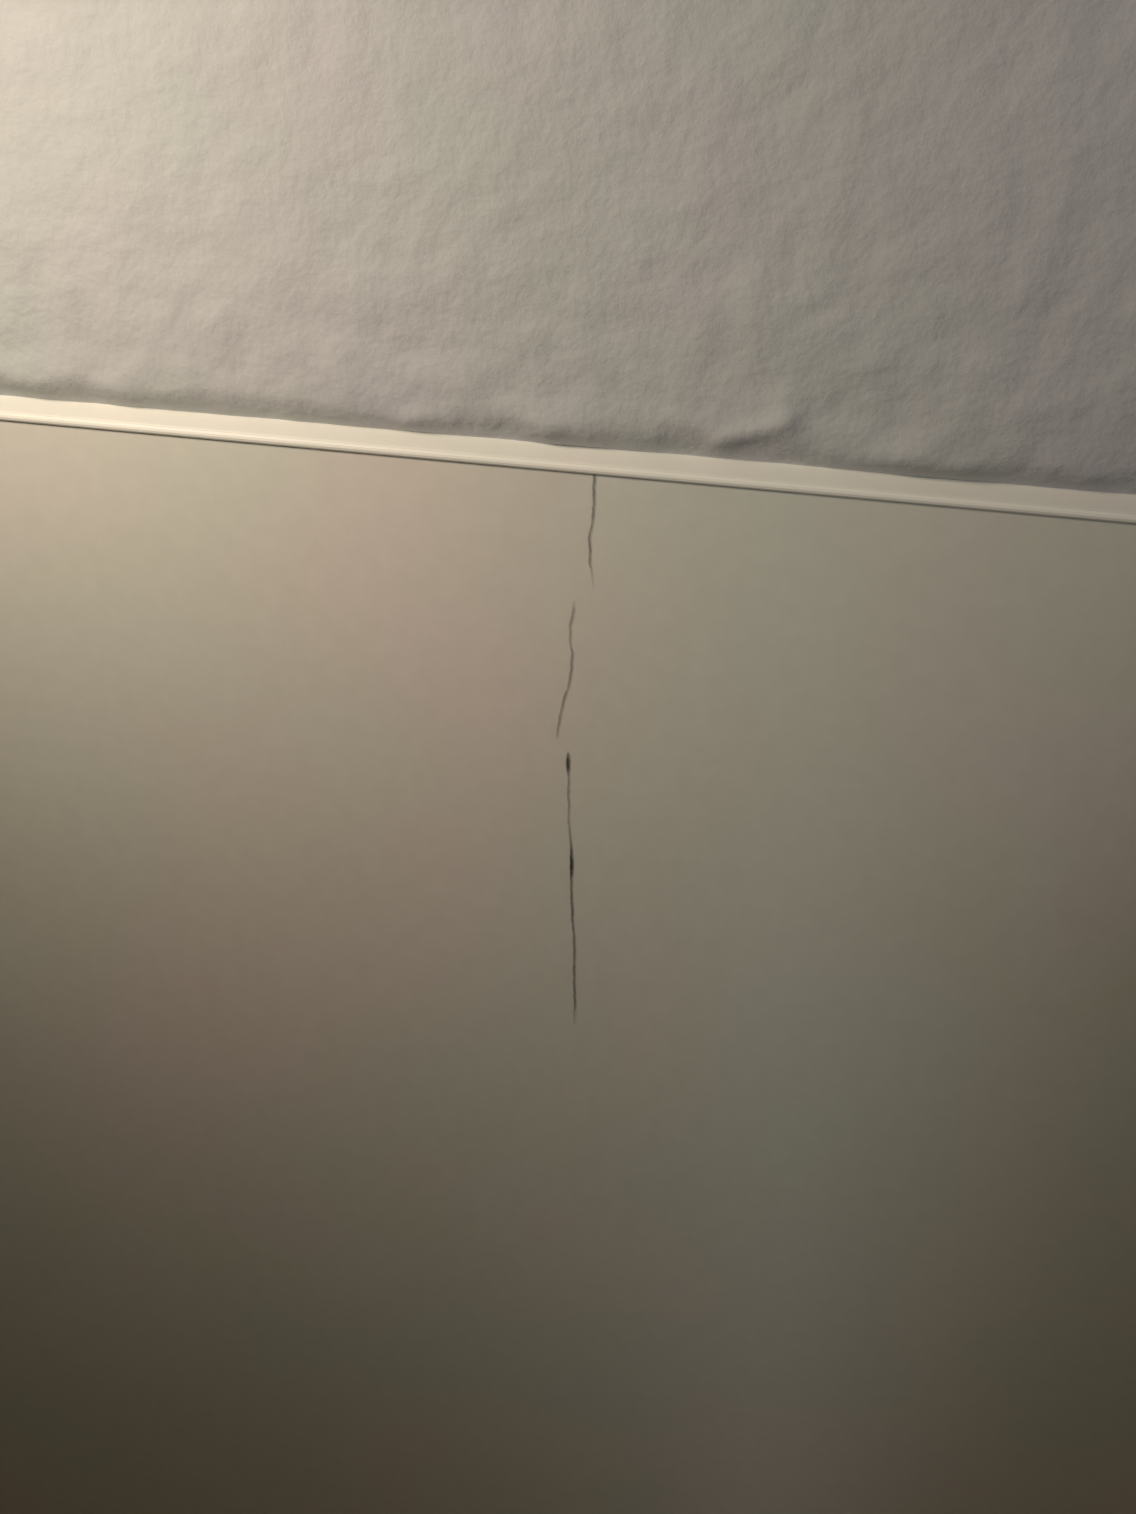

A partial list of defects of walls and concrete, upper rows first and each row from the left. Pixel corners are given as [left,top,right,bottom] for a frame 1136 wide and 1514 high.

crack [587,475,595,562]
crack [568,843,576,1008]